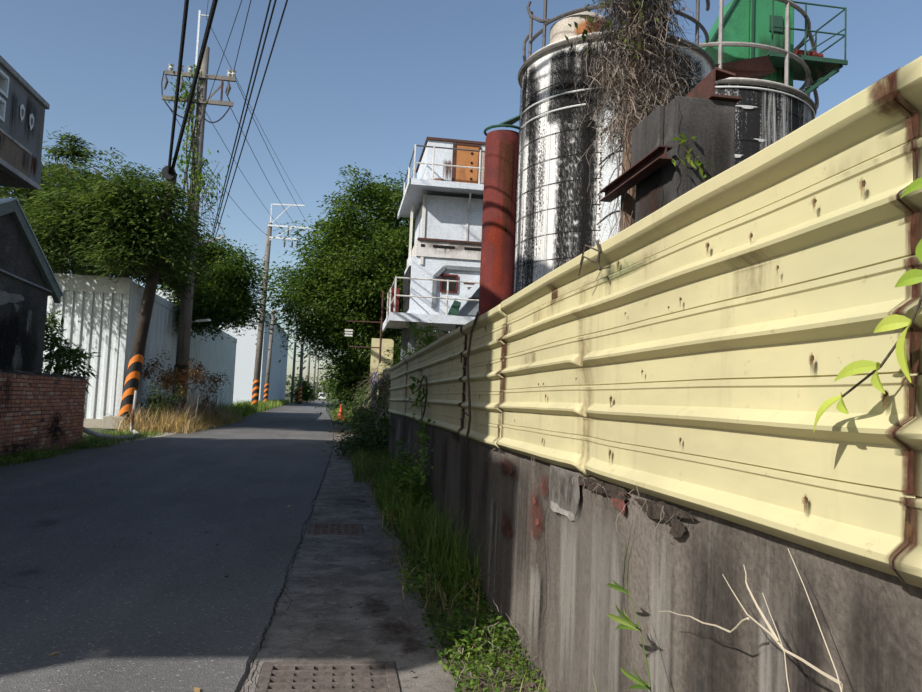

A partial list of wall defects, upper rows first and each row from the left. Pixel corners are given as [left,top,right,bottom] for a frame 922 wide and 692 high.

rust [487,140,515,284]
damp [516,46,613,292]
damp [764,97,788,147]
rust [870,68,921,272]
peeling [0,290,24,312]
rust [889,283,919,315]
rust [886,323,922,583]
damp [530,575,540,625]
damp [560,521,619,692]